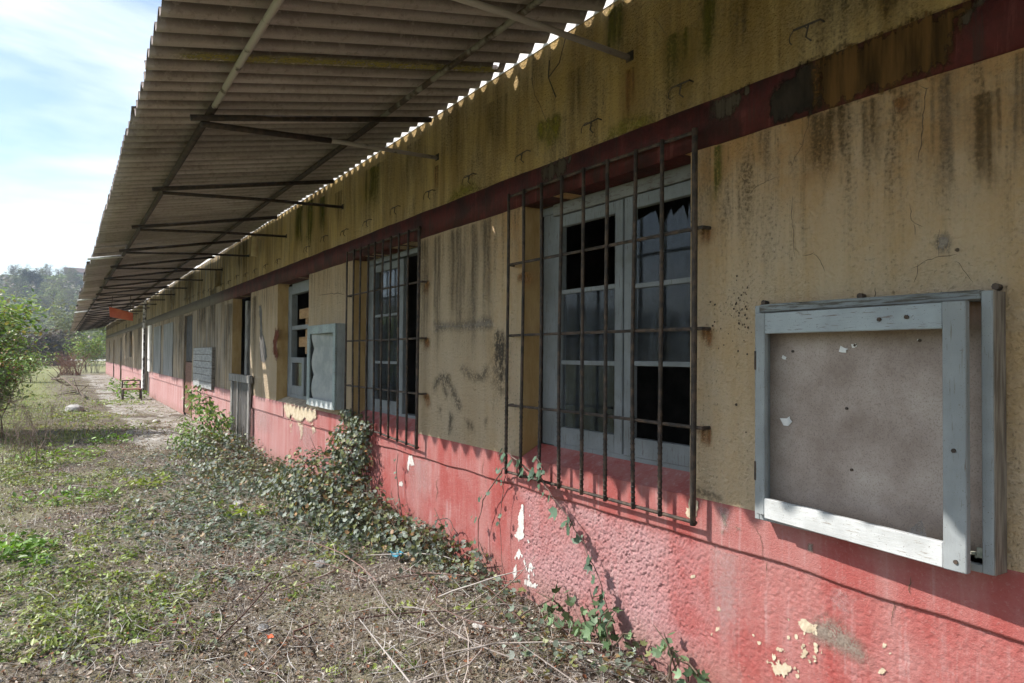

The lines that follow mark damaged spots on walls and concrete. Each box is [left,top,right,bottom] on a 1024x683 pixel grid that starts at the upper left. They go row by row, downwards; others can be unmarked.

damp [608,3,621,47]
peeling [769,0,972,124]
spalling [283,403,316,439]
peeling [513,504,538,588]
spalling [766,619,822,679]